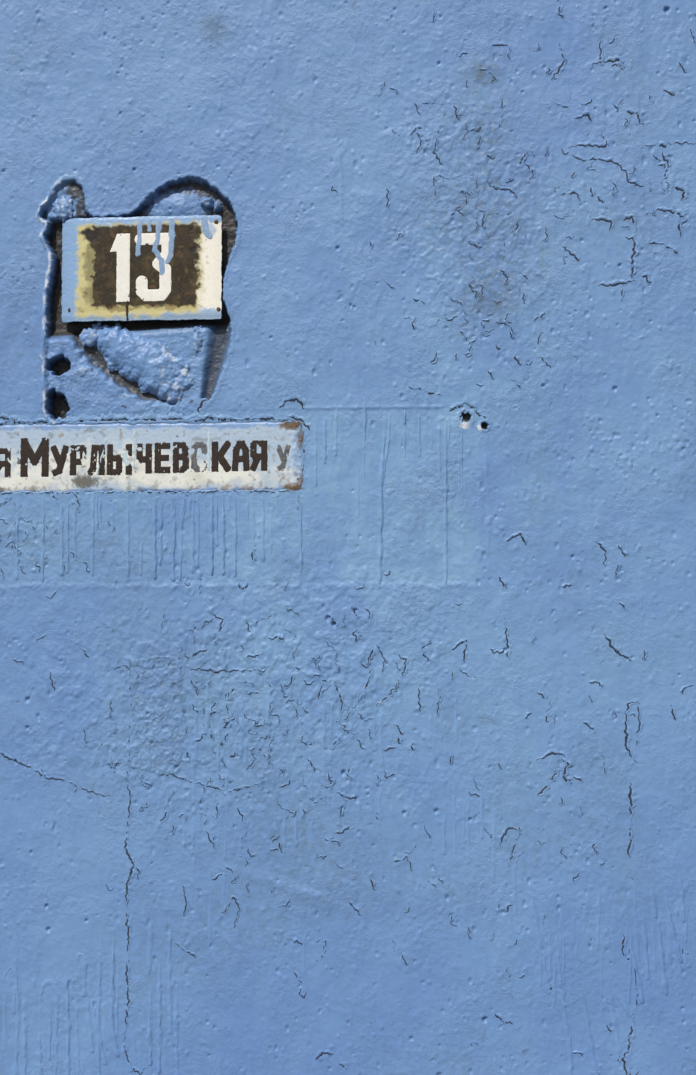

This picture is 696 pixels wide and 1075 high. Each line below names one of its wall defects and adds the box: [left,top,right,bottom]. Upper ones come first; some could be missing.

peeling [391,99,449,197]
peeling [545,43,568,81]
peeling [591,34,625,70]
peeling [612,88,675,127]
peeling [450,98,696,304]
peeling [445,276,552,369]
peeling [327,605,373,642]
peeling [83,613,432,871]
peeling [416,688,443,716]
crack [0,751,147,1075]
peeling [212,808,283,929]
crack [619,935,640,1075]